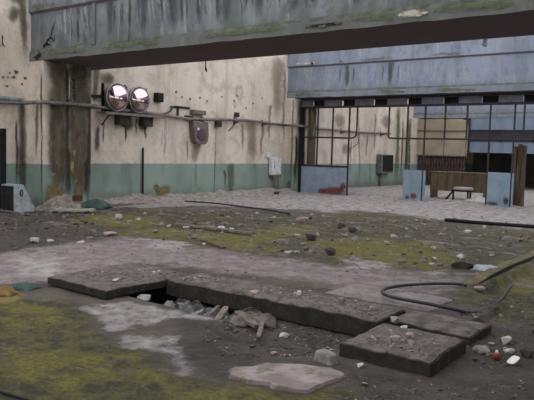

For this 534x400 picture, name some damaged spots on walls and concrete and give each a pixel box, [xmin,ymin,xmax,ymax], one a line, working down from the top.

water stain [137,0,187,26]
crack [34,22,55,60]
water stain [275,63,286,124]
water stain [49,61,113,191]
water stain [242,107,271,149]